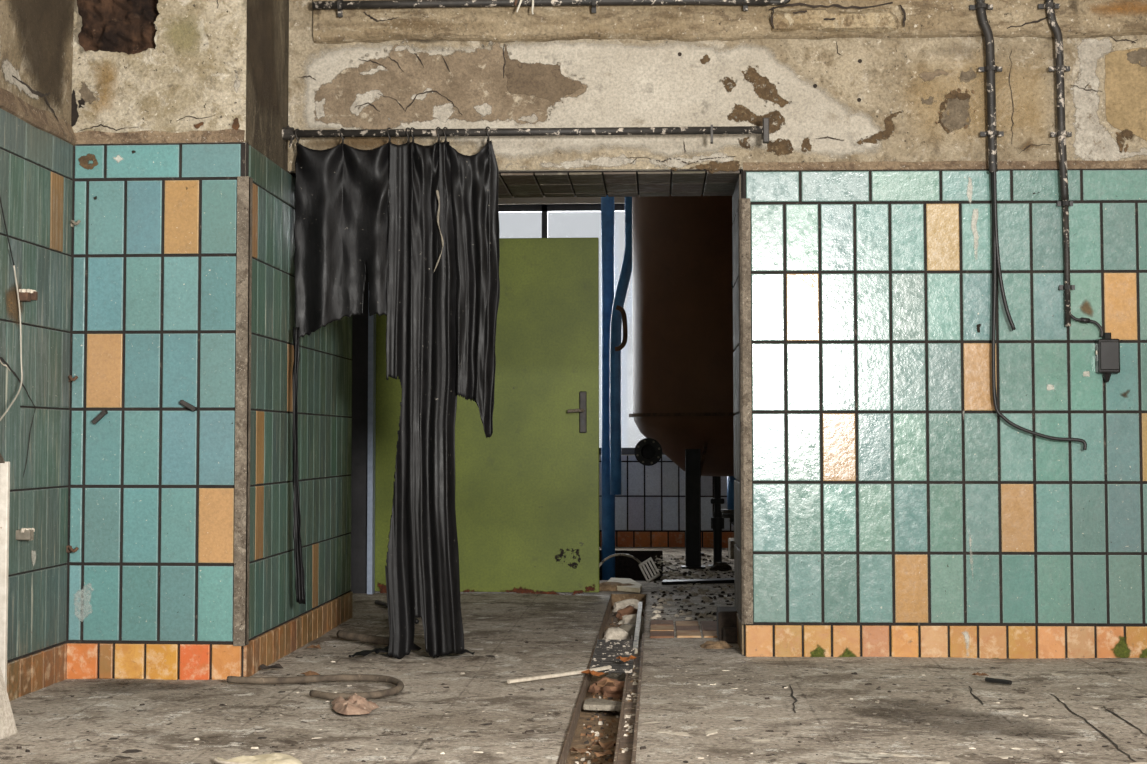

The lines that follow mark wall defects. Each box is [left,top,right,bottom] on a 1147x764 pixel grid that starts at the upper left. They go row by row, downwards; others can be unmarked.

spalling [77,0,160,55]
peeling [314,41,588,129]
peeling [654,159,743,174]
peeling [719,65,812,156]
peeling [857,111,903,145]
spalling [920,68,976,134]
spalling [1116,129,1133,153]
crack [789,684,798,713]
crack [1049,693,1146,762]